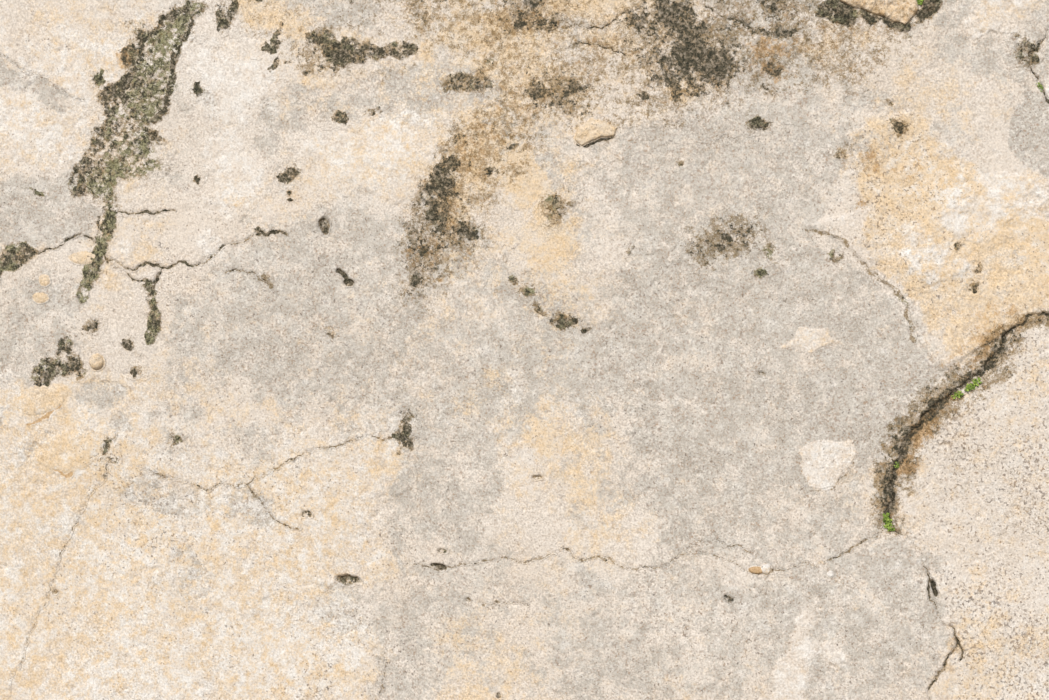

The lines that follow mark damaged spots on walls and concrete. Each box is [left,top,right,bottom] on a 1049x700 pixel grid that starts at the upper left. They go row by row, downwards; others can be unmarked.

crack [548,10,631,57]
crack [704,6,752,29]
crack [1030,29,1049,105]
crack [38,208,289,290]
leakage [188,0,947,603]
crack [404,311,1049,700]